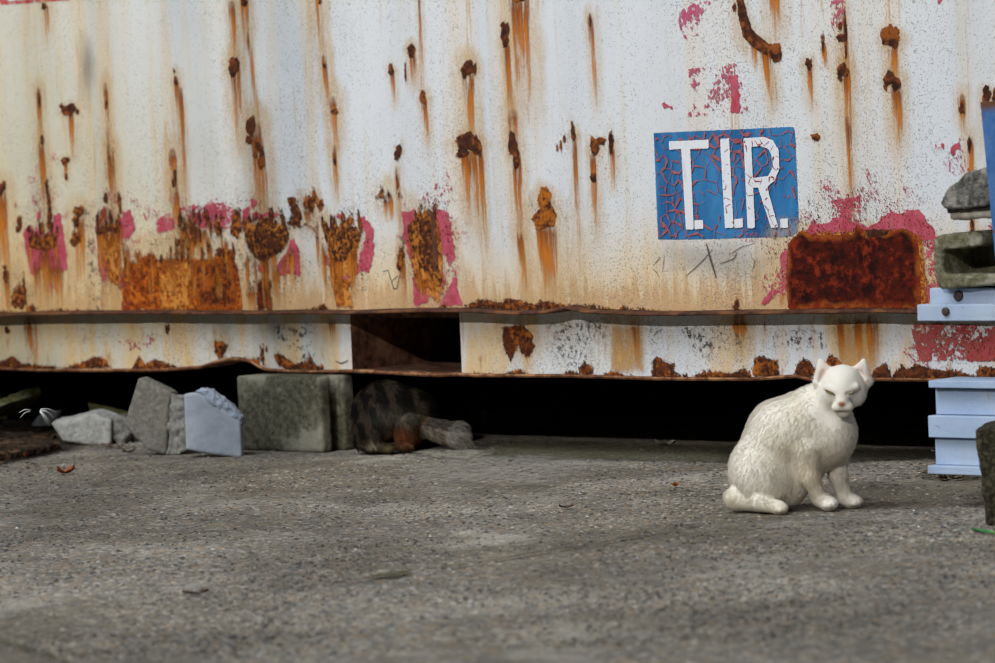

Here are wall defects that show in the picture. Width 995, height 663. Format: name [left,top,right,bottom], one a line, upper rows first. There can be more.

rust [0,180,100,313]
rust [122,0,377,311]
rust [453,60,486,219]
rust [500,0,530,96]
rust [508,115,563,287]
peeling [678,1,710,39]
peeling [688,63,748,116]
crack [655,129,796,239]
peeling [731,168,942,309]
rust [880,24,902,135]
rust [549,297,780,378]
peeling [903,321,995,371]